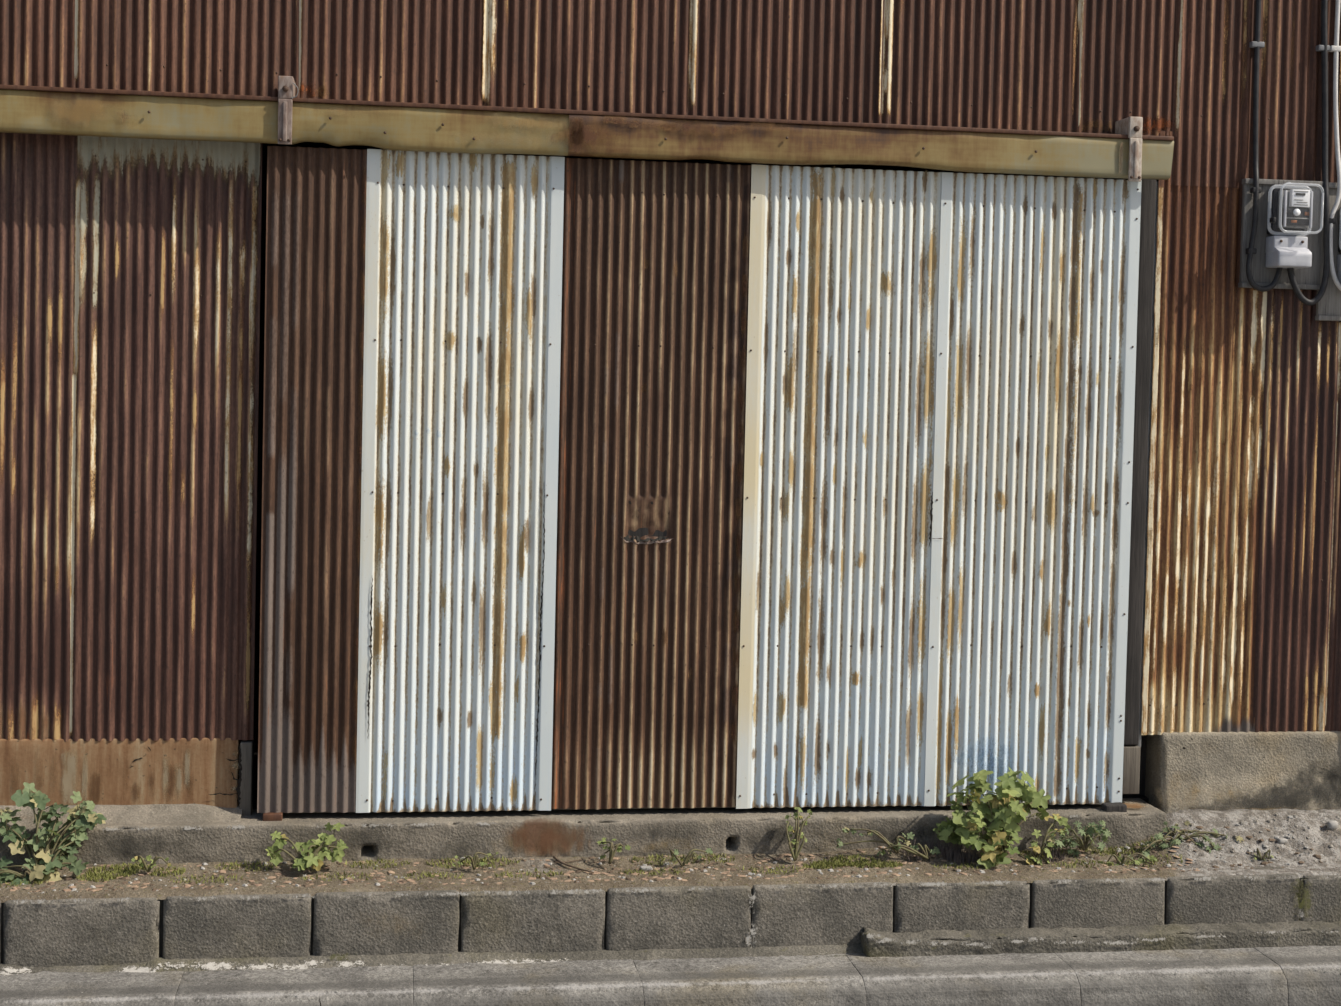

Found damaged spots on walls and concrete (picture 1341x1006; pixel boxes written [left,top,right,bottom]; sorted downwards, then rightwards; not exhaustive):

rust [362,150,404,202]
rust [361,220,396,323]
rust [358,358,393,462]
rust [356,481,391,567]
rust [377,136,583,855]
rust [752,170,975,808]
rust [994,491,1007,512]
rust [1032,178,1144,808]
rust [355,582,389,664]
rust [0,698,62,740]
rust [133,768,193,799]
leakage [1190,763,1341,811]